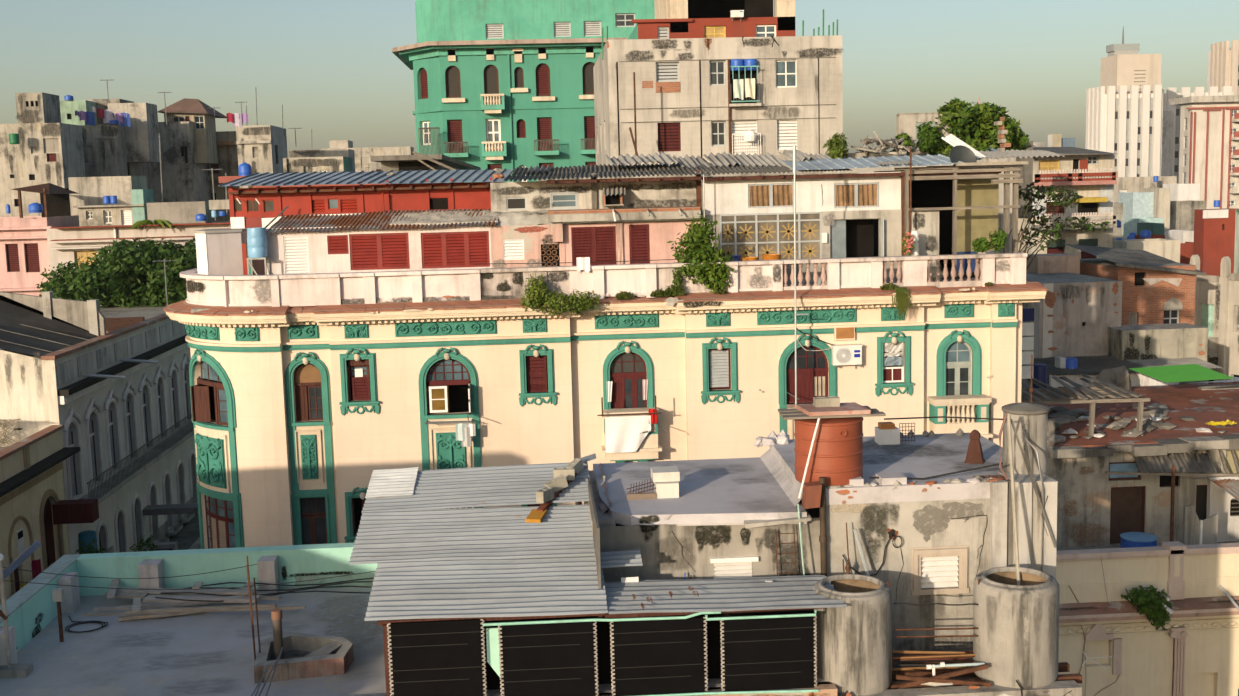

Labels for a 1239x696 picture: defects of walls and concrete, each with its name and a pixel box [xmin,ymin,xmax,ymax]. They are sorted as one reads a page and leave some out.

peeling [828,475,1004,542]
damp [639,515,809,576]